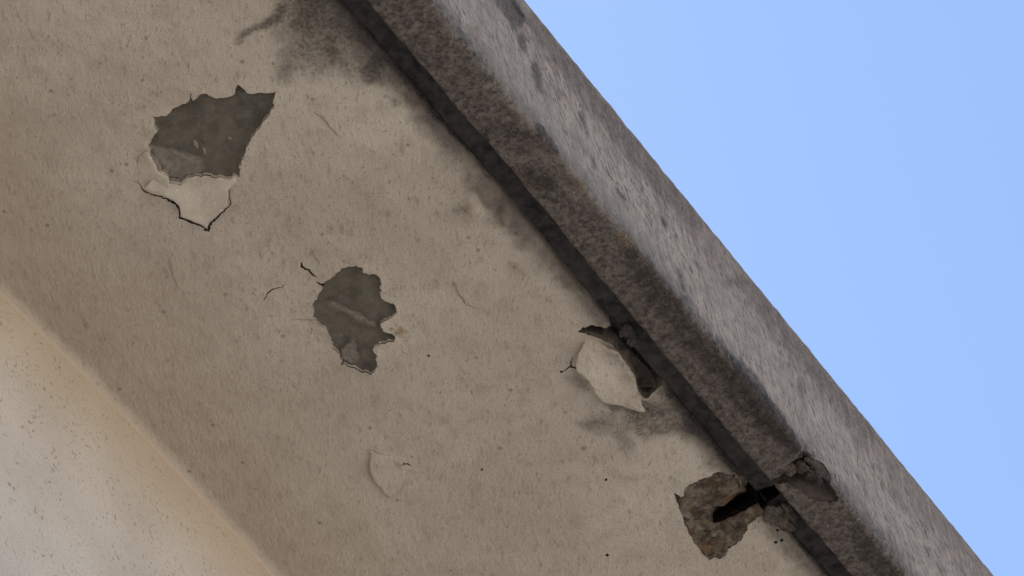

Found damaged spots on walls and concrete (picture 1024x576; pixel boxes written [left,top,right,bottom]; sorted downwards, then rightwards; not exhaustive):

peeling [137,85,276,231]
peeling [312,265,397,374]
flaking render [575,318,663,412]
spalling [674,450,839,560]